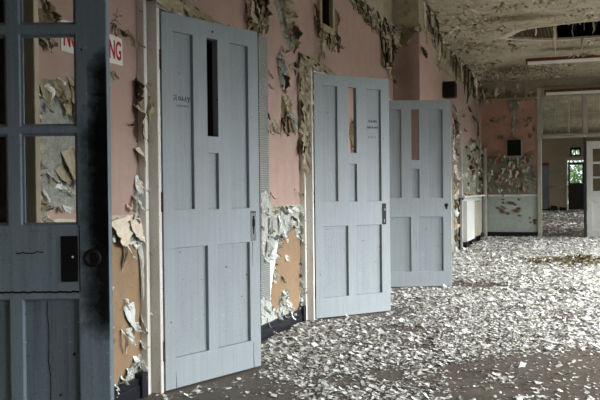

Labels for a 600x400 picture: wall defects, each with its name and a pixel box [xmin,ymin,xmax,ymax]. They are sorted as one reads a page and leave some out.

flaking render [39,75,75,124]
flaking render [40,136,76,222]
peeling [131,75,155,143]
peeling [244,0,343,178]
peeling [349,0,600,252]
peeling [112,168,155,398]
peeling [261,188,308,332]